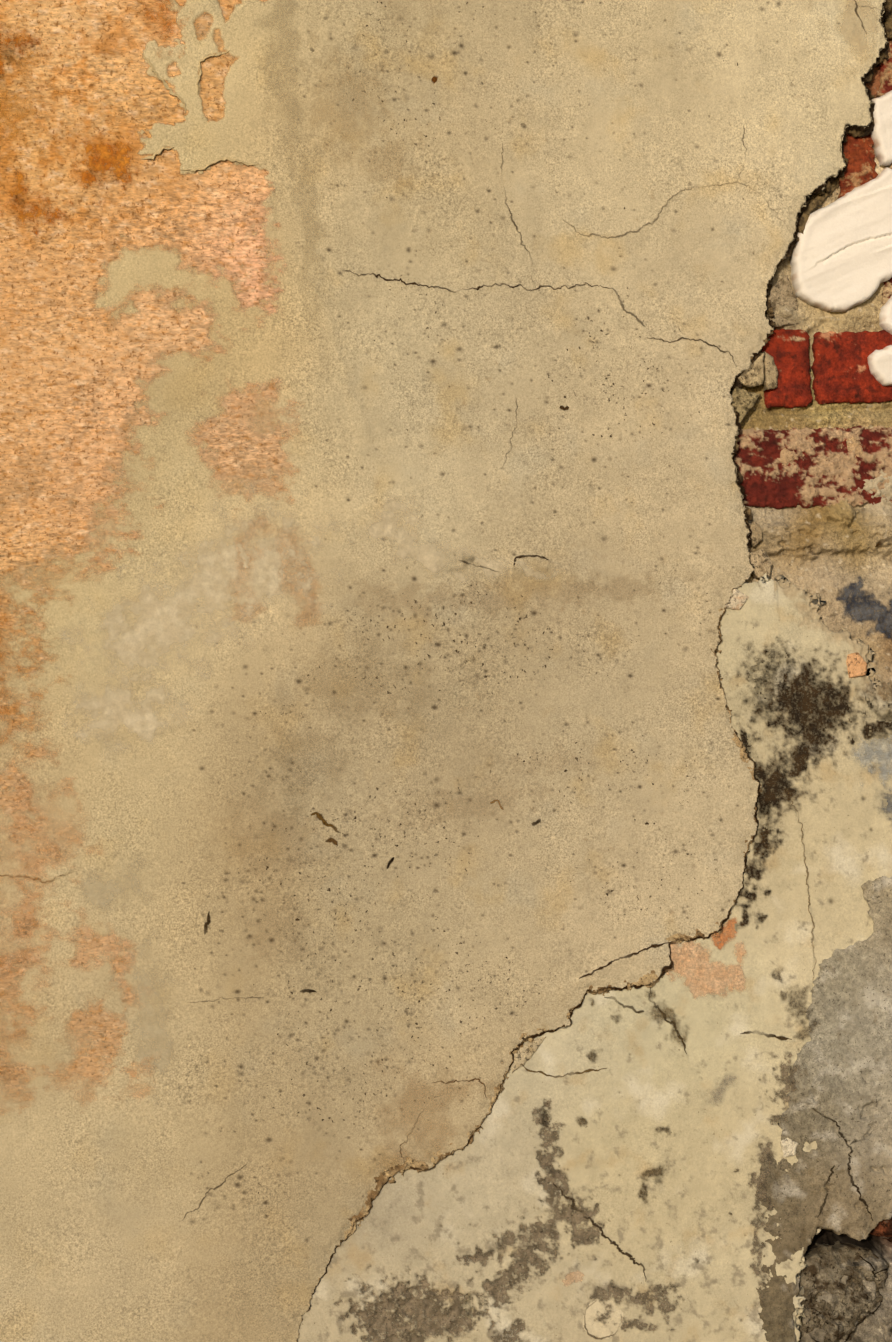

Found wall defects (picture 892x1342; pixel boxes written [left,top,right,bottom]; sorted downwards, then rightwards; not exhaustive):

flaking render [0,0,293,677]
crack [345,270,735,363]
flaking render [296,0,892,1342]
crack [434,1078,486,1096]
crack [522,1064,607,1078]
crack [579,941,687,1054]
crack [740,1031,792,1040]
crack [553,1183,646,1282]
crack [584,1323,614,1339]